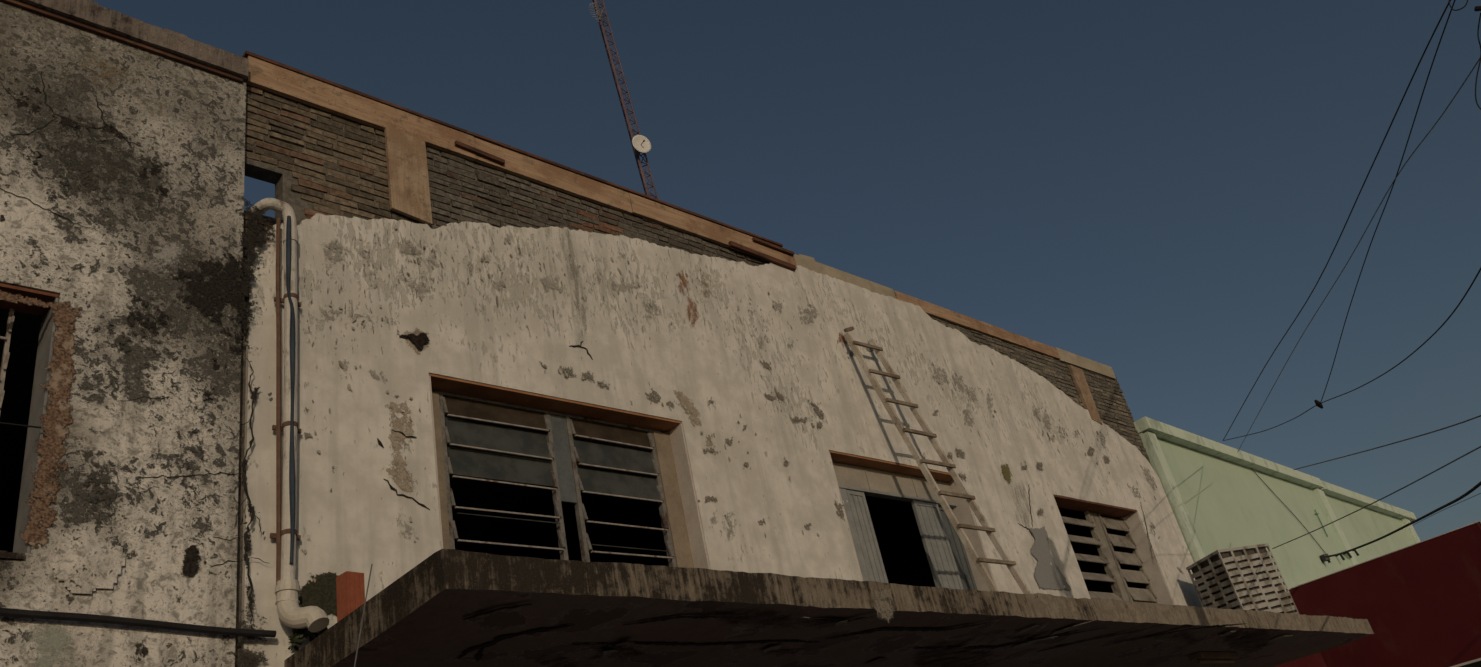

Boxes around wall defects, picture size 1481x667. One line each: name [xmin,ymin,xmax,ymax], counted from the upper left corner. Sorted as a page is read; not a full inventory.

crack [0,71,143,147]
crack [0,188,96,230]
leakage [18,115,184,227]
leakage [87,196,275,385]
spalling [311,300,430,354]
peeling [319,225,443,301]
flaking render [0,290,82,549]
leakage [48,427,146,523]
leakage [172,387,223,482]
peeling [338,359,430,542]
spalling [1018,461,1071,590]
crack [458,603,1246,661]